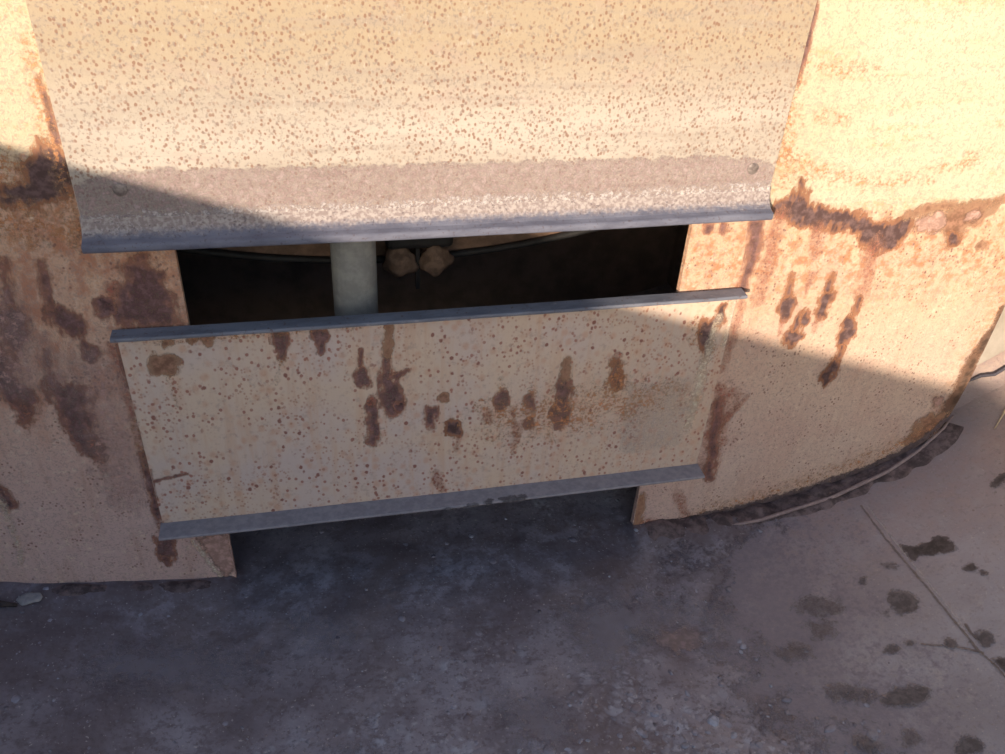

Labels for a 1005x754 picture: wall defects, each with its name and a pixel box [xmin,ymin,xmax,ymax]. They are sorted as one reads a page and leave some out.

corrosion [0,36,81,248]
corrosion [689,102,1005,389]
corrosion [0,252,184,567]
corrosion [352,325,410,447]
corrosion [474,352,687,451]
corrosion [834,306,1005,469]
damp [826,683,931,706]
damp [885,589,919,615]
damp [900,535,955,561]
crack [861,505,1005,677]
damp [955,736,985,754]
damp [973,629,995,647]